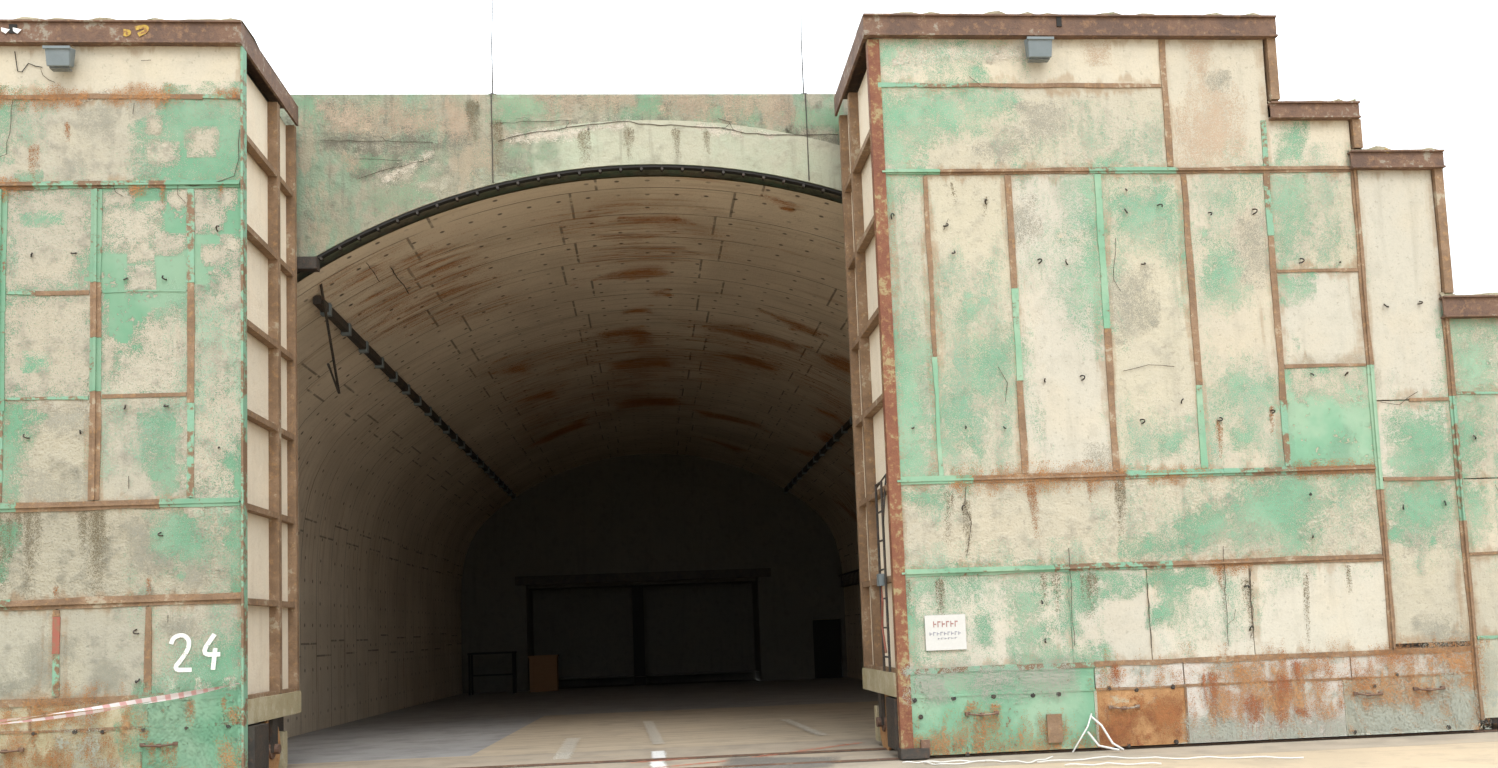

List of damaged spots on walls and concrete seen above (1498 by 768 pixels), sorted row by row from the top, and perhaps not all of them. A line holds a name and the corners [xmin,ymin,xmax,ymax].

corrosion [0,82,181,140]
crack [498,117,838,142]
peeling [0,81,241,768]
corrosion [308,223,545,351]
corrosion [525,189,752,346]
corrosion [695,309,850,375]
peeling [870,38,1498,707]
corrosion [0,679,185,768]
corrosion [913,633,1490,755]